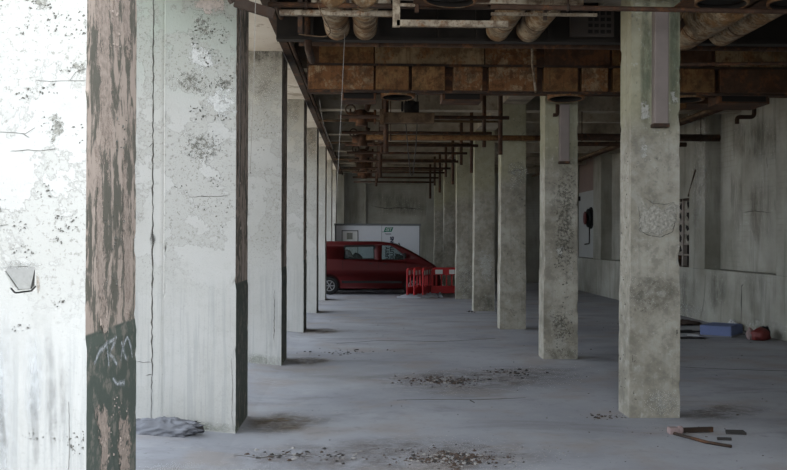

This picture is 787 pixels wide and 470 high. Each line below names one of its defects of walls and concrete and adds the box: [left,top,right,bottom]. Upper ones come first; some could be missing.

peeling [18,0,86,38]
peeling [41,113,83,144]
spalling [3,245,36,294]